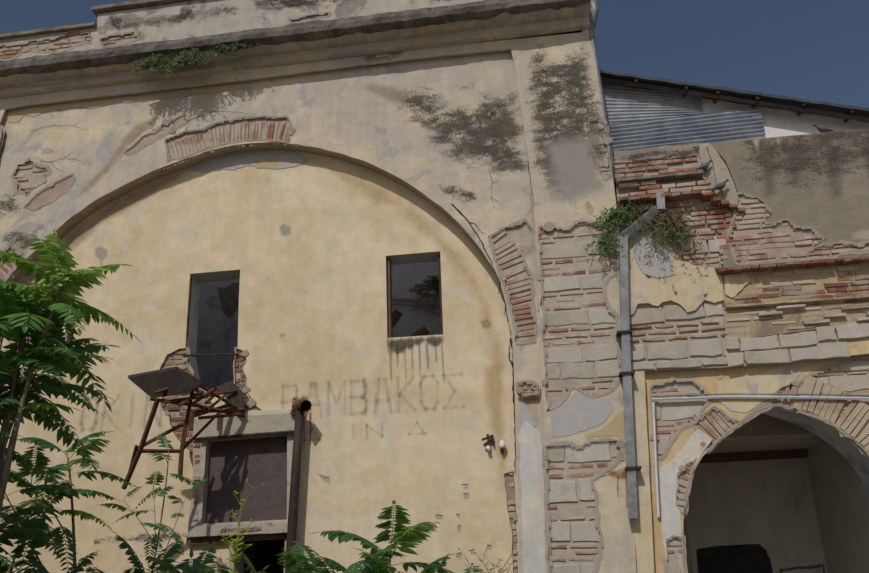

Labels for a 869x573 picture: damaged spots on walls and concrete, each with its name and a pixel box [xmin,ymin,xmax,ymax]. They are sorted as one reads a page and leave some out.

damp [255,0,324,10]
flaking render [10,148,76,212]
flaking render [123,114,308,173]
damp [374,53,604,195]
damp [745,129,869,186]
flaking render [726,192,869,265]
flaking render [160,347,194,376]
damp [388,337,441,353]
flaking render [488,202,625,573]
flaking render [650,355,869,461]
flaking render [676,458,698,519]
flaking render [663,535,688,573]